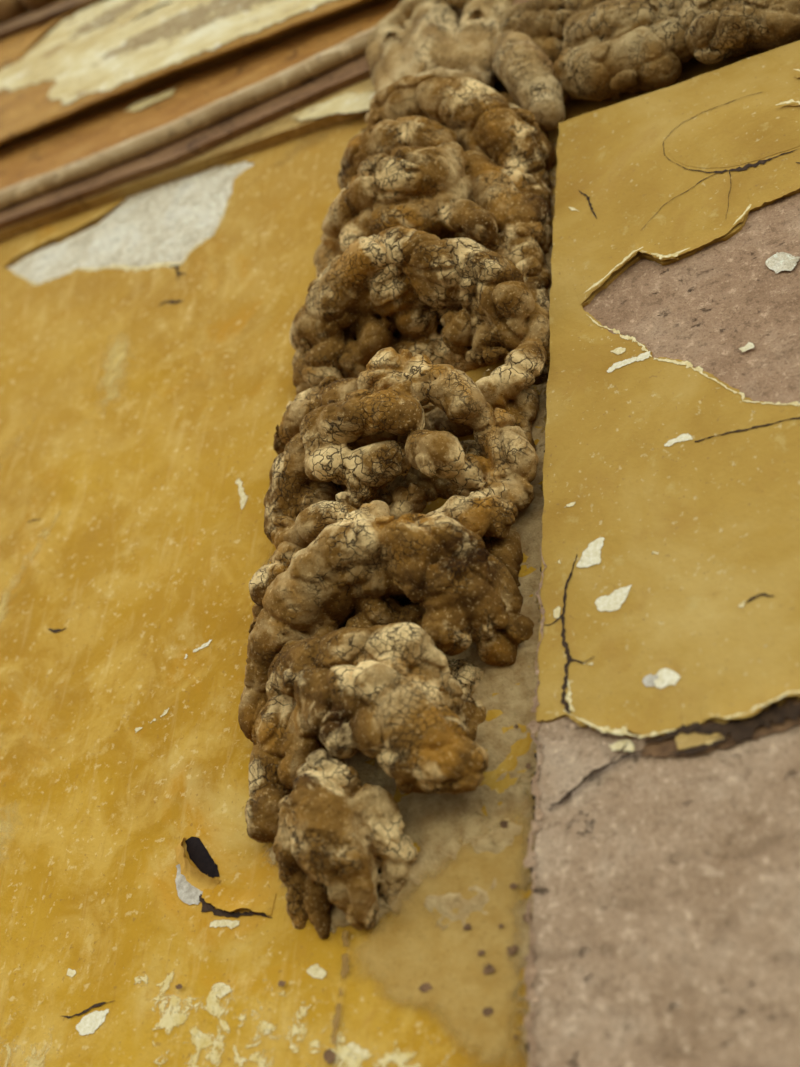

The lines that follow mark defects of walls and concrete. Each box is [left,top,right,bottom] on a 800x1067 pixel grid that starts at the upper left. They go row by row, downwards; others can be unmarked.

peeling [0,0,332,106]
crack [642,92,800,229]
peeling [2,161,254,286]
spalling [573,175,800,406]
crack [695,417,800,442]
peeling [576,537,605,568]
crack [544,555,595,714]
crack [531,742,648,820]
spalling [506,547,800,1067]
peeling [175,836,276,929]
peeling [63,1000,115,1035]
peeling [135,972,426,1067]